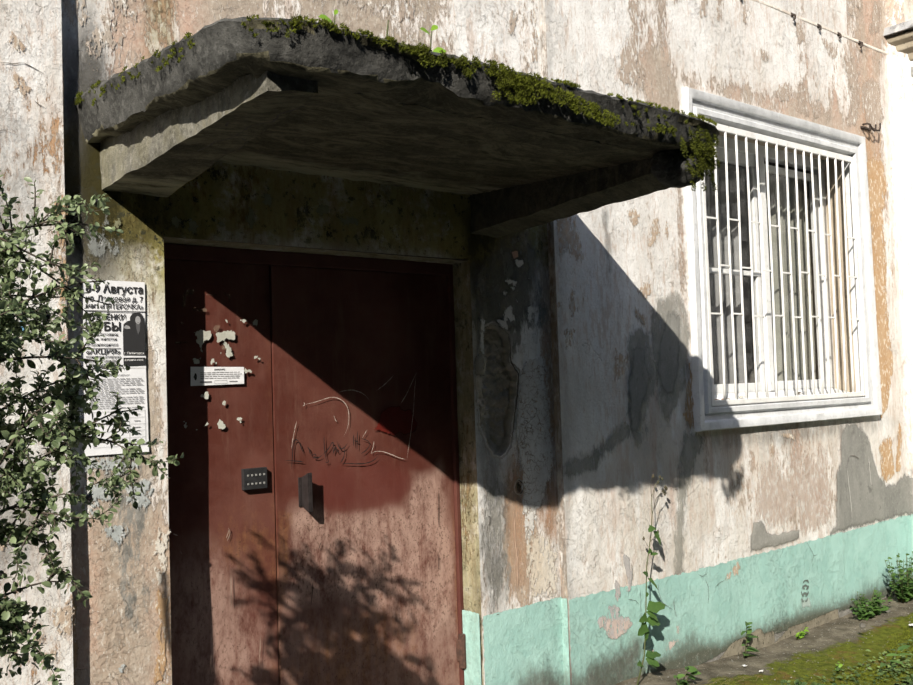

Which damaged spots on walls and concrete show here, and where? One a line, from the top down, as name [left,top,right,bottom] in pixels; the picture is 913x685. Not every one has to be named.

peeling [508,11,518,37]
peeling [530,0,539,62]
peeling [617,0,645,90]
peeling [698,0,724,21]
peeling [795,22,806,44]
spalling [11,72,31,99]
peeling [867,157,893,418]
spalling [473,301,538,459]
crack [514,355,556,592]
peeling [879,423,902,482]
peeling [151,525,170,587]
peeling [597,555,633,640]